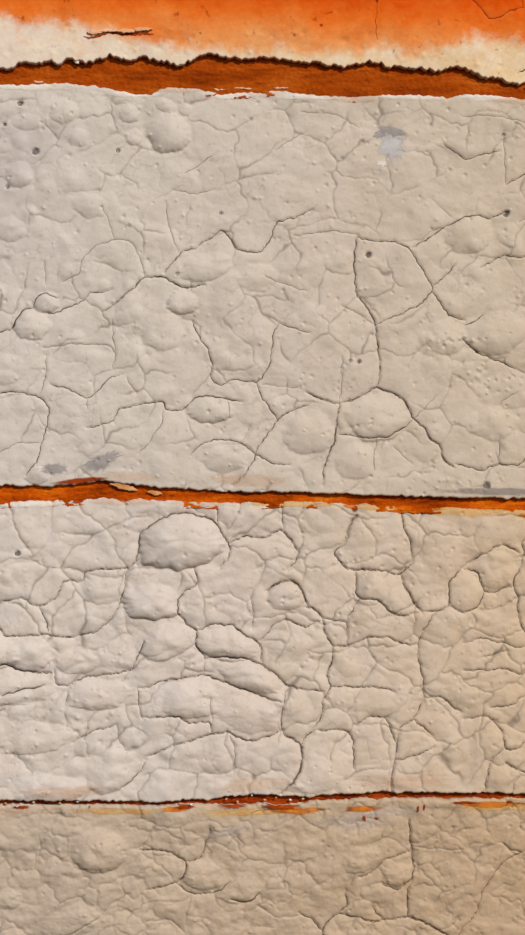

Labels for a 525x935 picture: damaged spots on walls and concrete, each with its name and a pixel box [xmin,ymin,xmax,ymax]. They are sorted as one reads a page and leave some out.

peeling [83,27,154,39]
crack [473,0,523,19]
peeling [0,55,525,103]
crack [275,111,358,150]
crack [444,114,525,182]
crack [0,154,525,483]
rust [0,477,525,518]
crack [0,510,525,794]
rust [0,791,525,821]
crack [143,822,521,935]